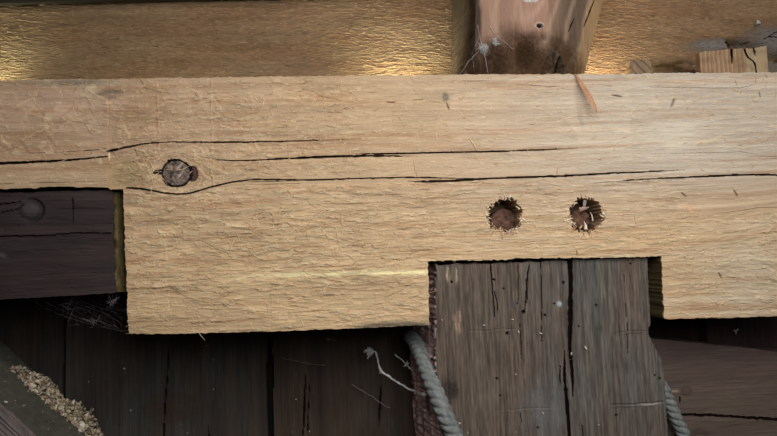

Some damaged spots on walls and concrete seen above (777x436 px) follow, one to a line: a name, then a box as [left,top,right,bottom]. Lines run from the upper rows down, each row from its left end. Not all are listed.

crack [0,139,777,195]
crack [559,258,574,436]
crack [667,398,777,420]